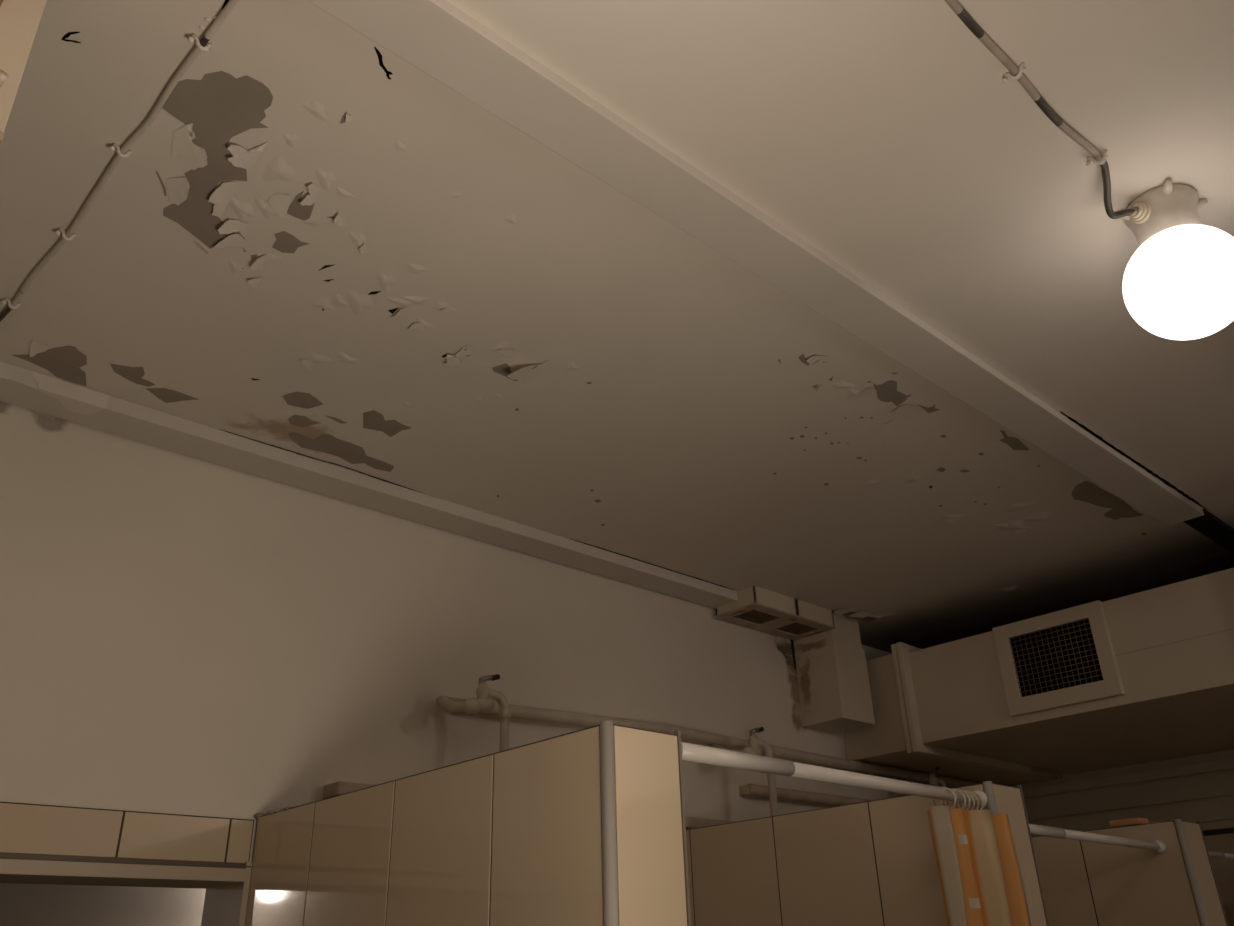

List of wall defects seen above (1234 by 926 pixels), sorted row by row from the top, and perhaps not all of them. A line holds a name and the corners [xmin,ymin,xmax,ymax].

crack [199,0,229,30]
peeling [155,71,356,289]
peeling [13,339,109,414]
peeling [110,363,198,403]
peeling [282,392,394,472]
peeling [363,410,411,437]
peeling [812,372,940,443]
peeling [999,430,1029,450]
peeling [1071,481,1143,520]
leakage [777,640,796,669]